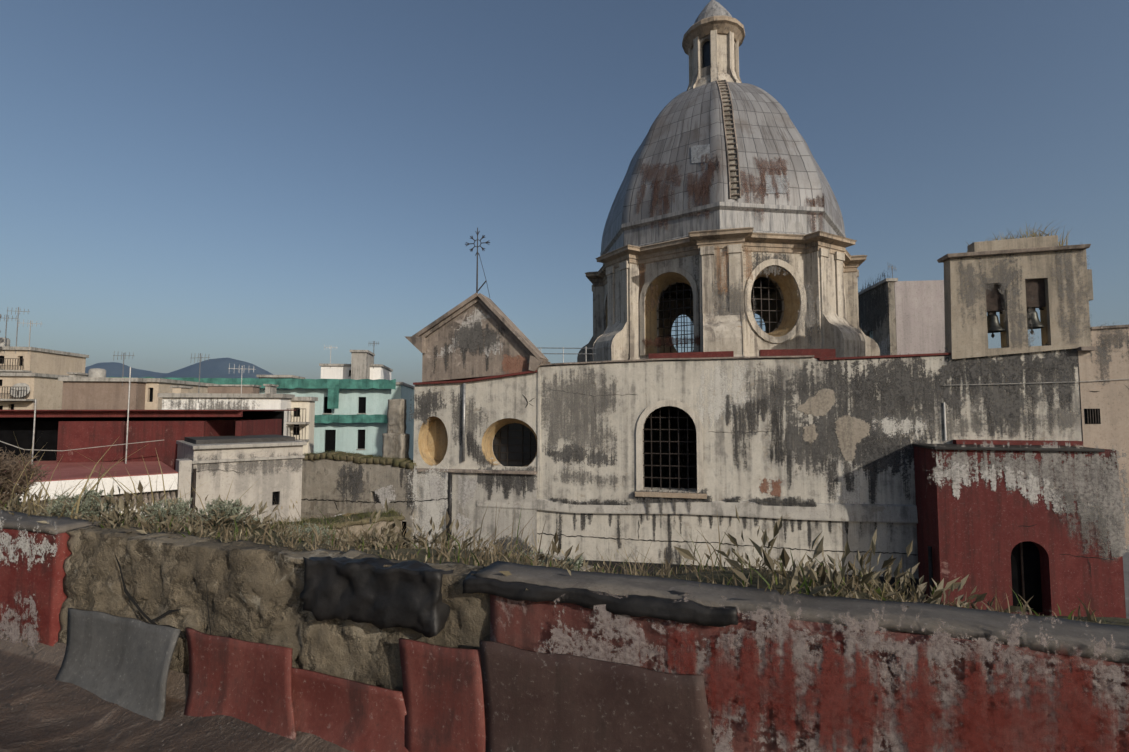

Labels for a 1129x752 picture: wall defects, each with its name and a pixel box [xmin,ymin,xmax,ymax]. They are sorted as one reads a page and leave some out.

corrosion [637,154,720,230]
corrosion [740,158,790,221]
water stain [433,320,502,371]
water stain [410,388,537,501]
water stain [499,536,543,557]
water stain [541,245,1129,565]
peeling [929,442,1129,557]
peeling [0,593,38,649]
flaking render [58,525,490,696]
peeling [537,598,1129,752]